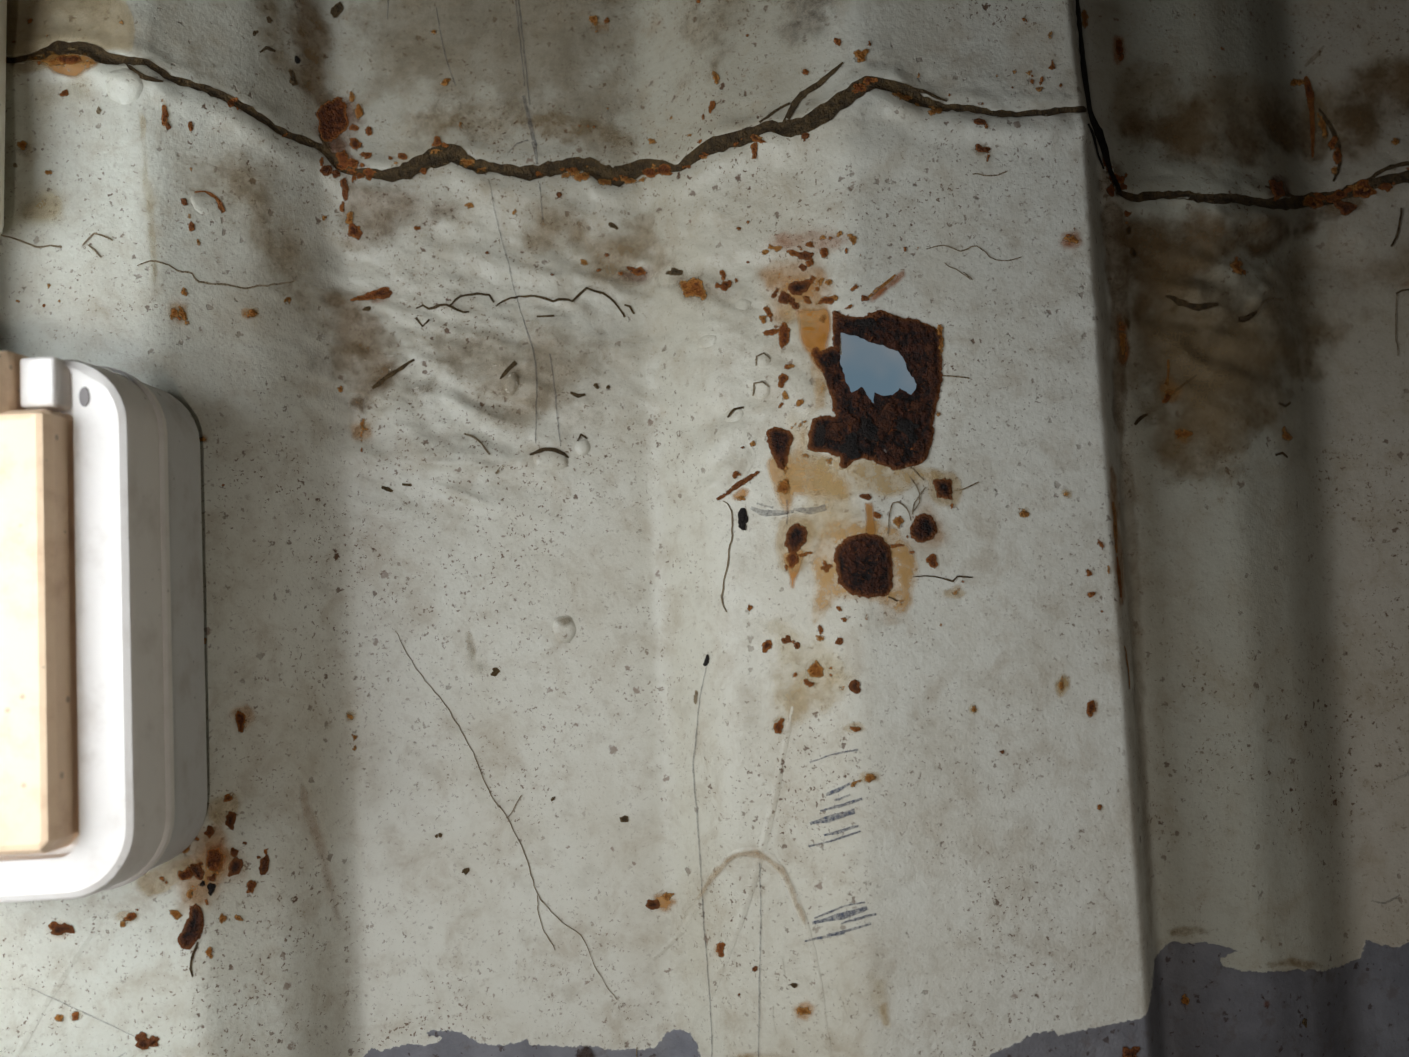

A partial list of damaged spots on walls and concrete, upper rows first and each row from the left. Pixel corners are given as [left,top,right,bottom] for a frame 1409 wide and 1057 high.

rust [316,91,407,240]
crack [6,0,1409,247]
rust [665,268,738,300]
rust [746,231,943,505]
crack [927,245,1022,280]
damp [1101,209,1314,458]
rust [738,508,748,530]
rust [762,635,800,653]
rust [793,660,861,694]
rust [784,494,938,645]
rust [933,478,954,509]
rust [144,794,269,977]